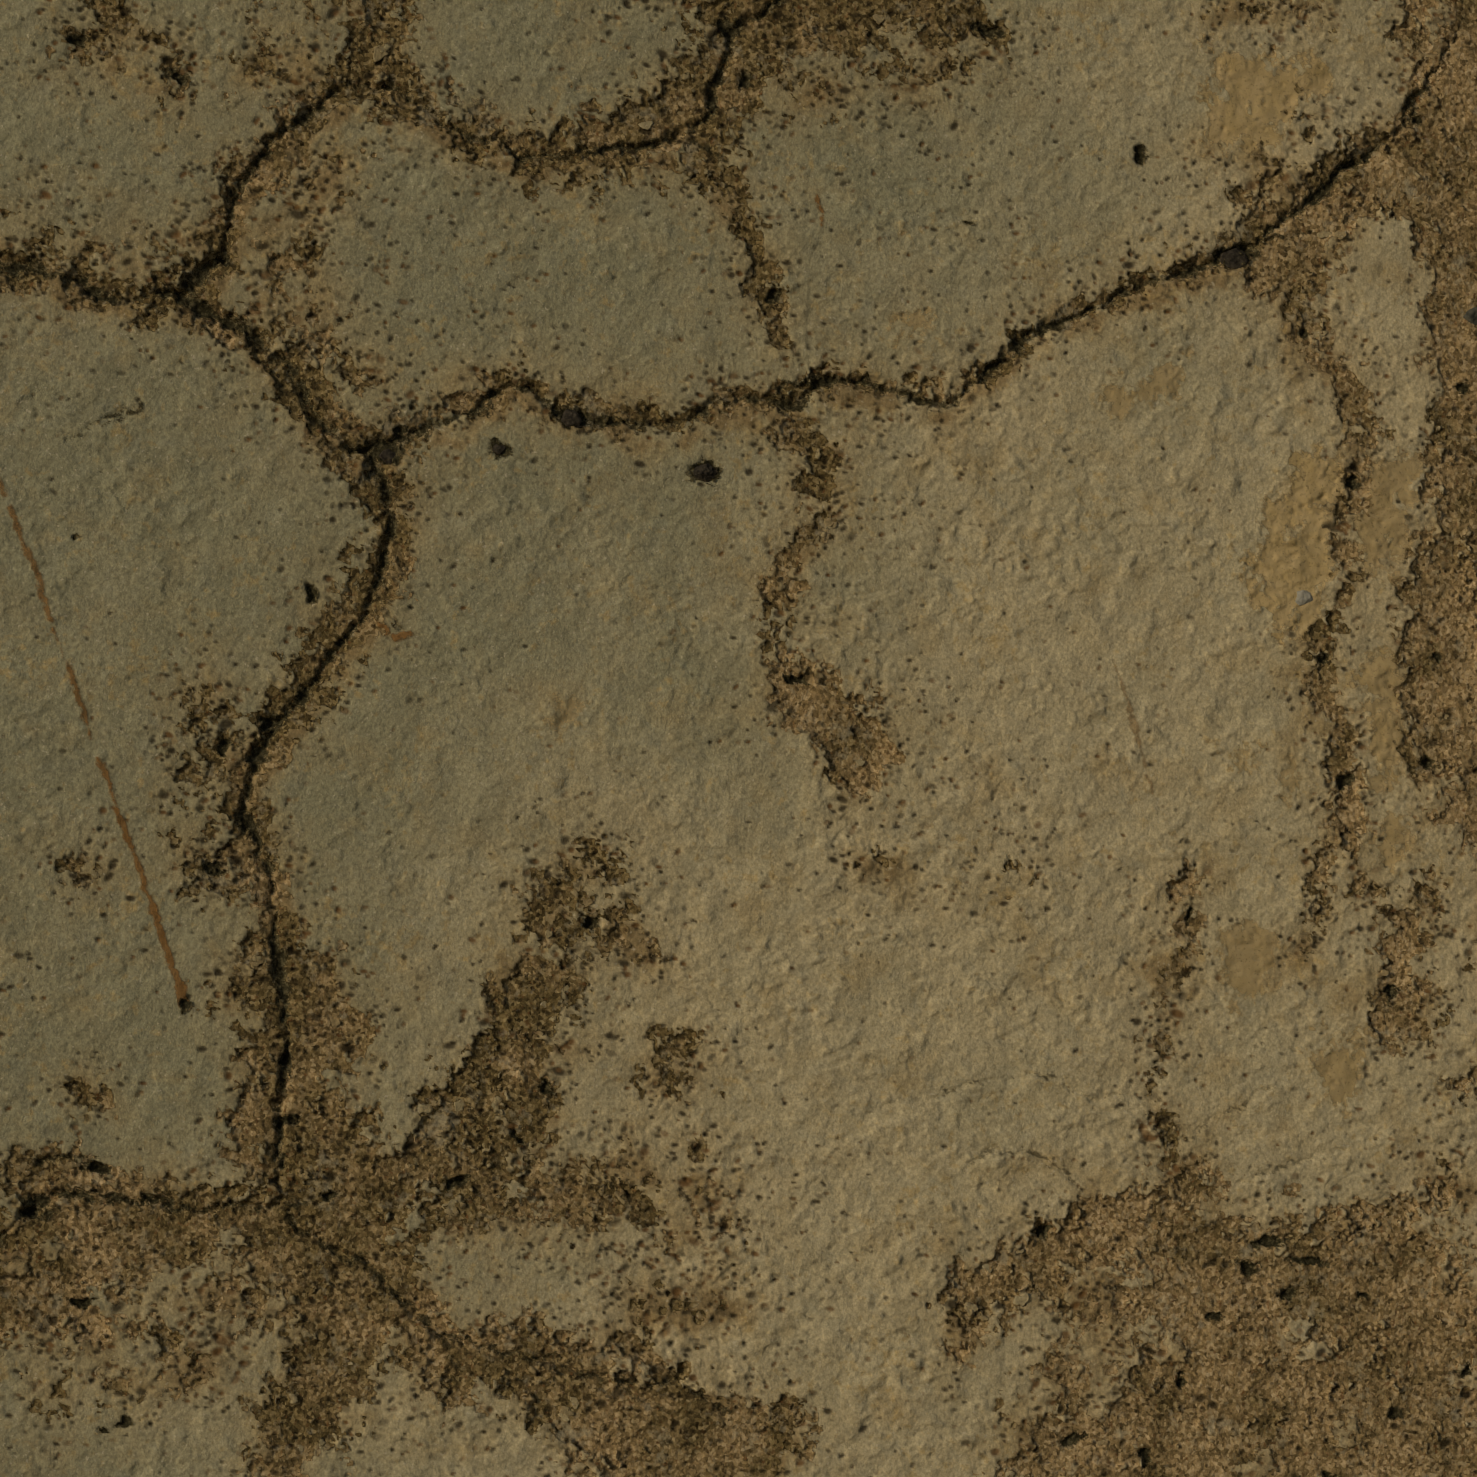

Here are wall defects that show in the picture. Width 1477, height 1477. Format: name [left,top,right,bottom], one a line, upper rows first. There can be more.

flaking render [512,0,1019,359]
rust [0,481,58,641]
rust [66,663,91,740]
rust [95,757,189,1007]
crack [0,0,1457,1174]
flaking render [756,410,906,800]
flaking render [1002,855,1039,887]
flaking render [1151,858,1211,1011]
flaking render [1238,0,1477,1119]
crack [0,1154,734,1414]
flaking render [0,831,824,1477]
flaking render [926,1029,1477,1477]